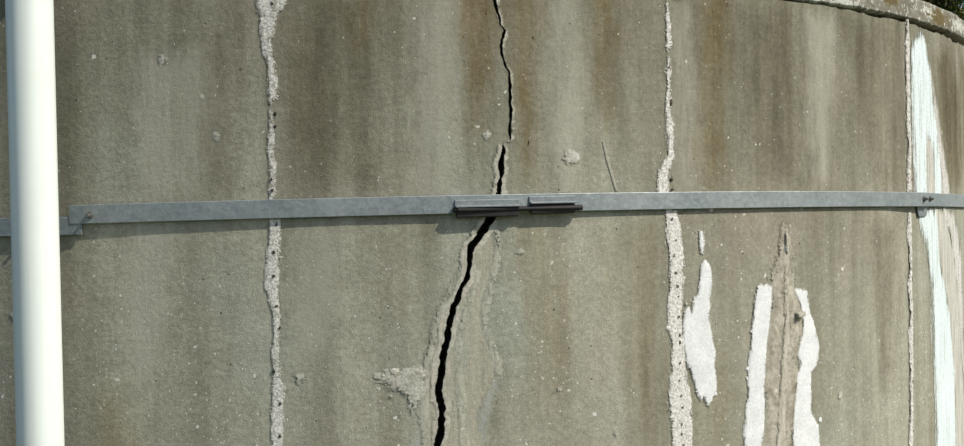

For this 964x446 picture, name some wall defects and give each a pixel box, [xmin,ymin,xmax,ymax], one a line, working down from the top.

water stain [255,0,287,200]
crack [429,0,517,446]
water stain [662,209,695,446]
water stain [655,0,711,192]
water stain [904,19,952,194]
water stain [906,206,964,446]